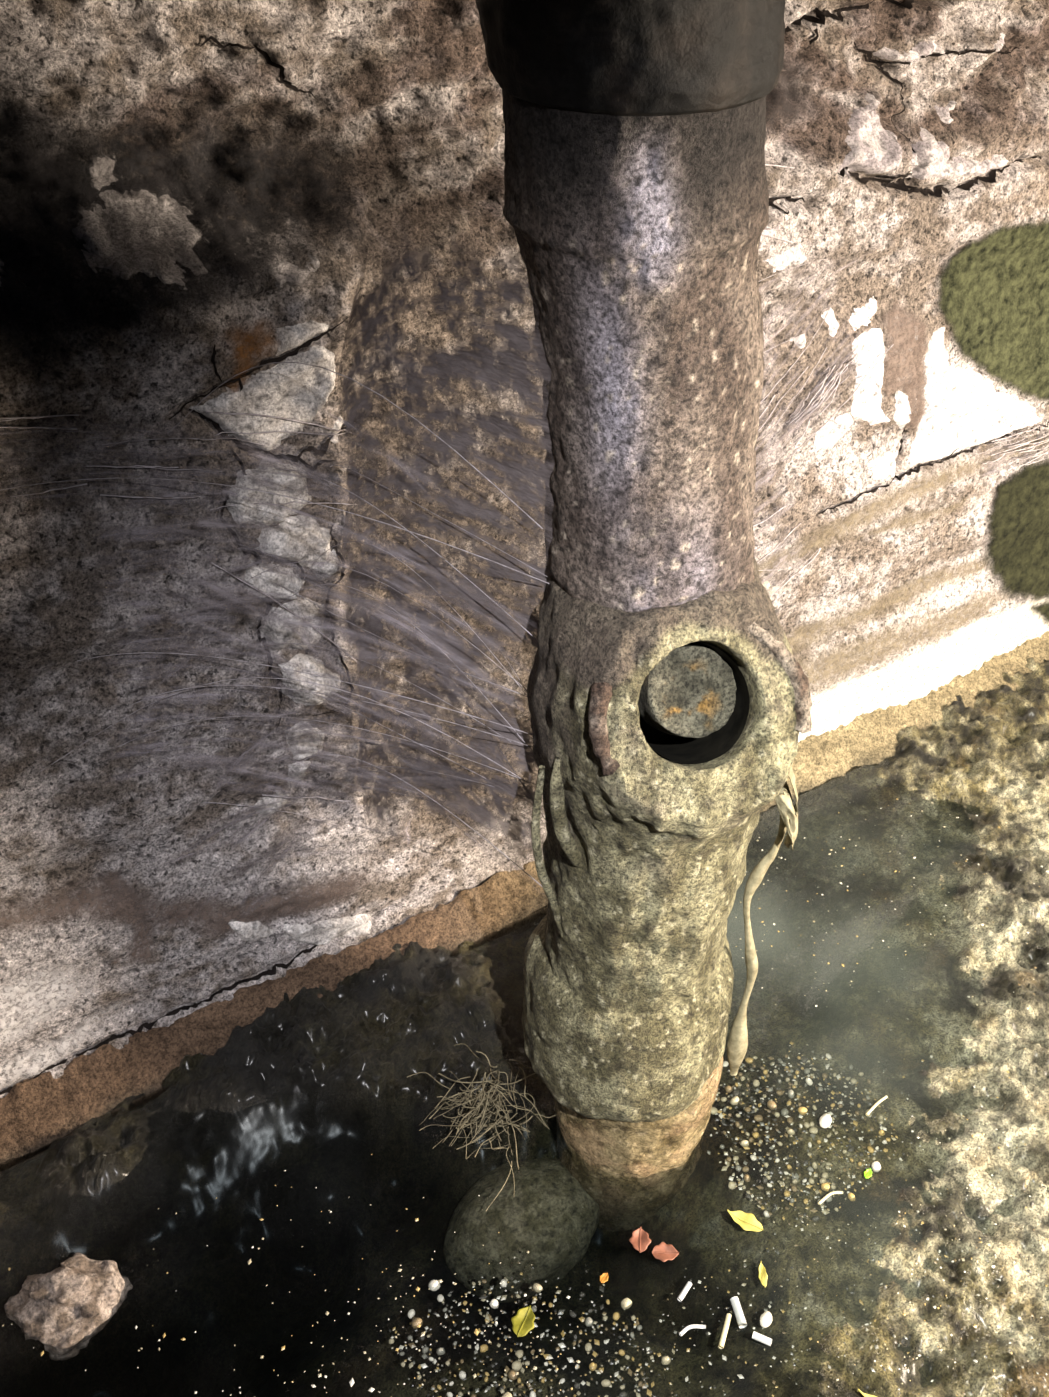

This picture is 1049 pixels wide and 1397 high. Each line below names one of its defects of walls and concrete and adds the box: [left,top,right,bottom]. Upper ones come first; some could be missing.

crack [785,0,1045,197]
crack [769,196,805,215]
peeling [813,296,1042,480]
crack [169,316,355,731]
spalling [189,320,343,817]
crack [0,945,317,1095]